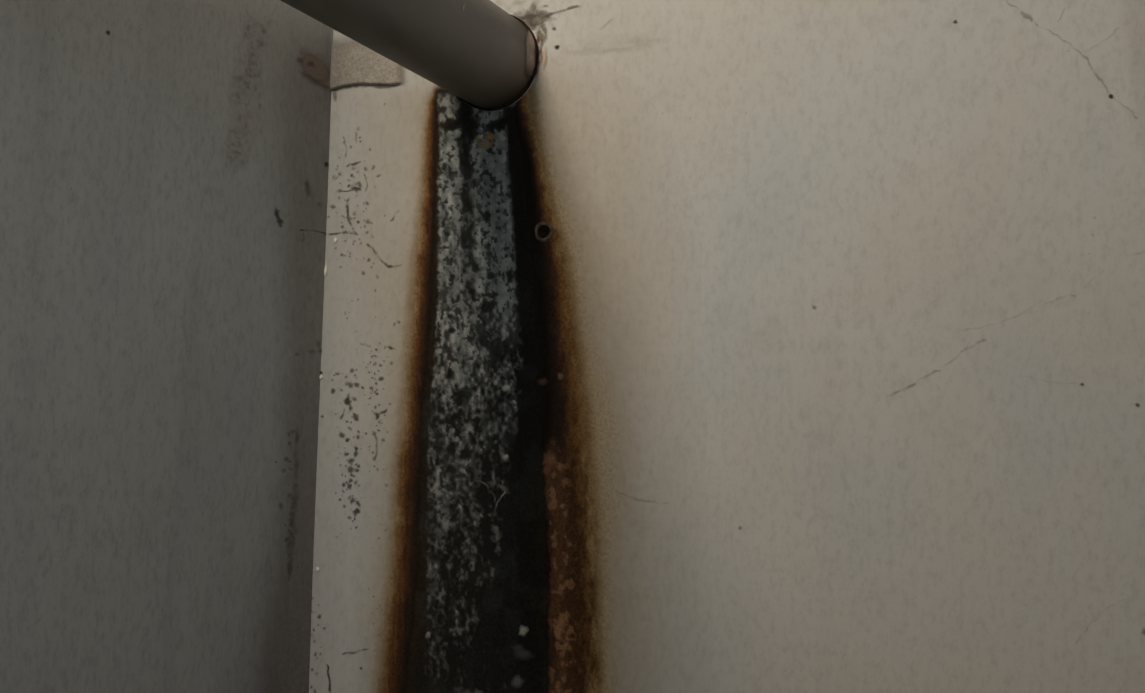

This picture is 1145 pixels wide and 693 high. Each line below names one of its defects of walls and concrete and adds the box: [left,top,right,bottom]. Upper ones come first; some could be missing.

damp [332,346,392,528]
damp [377,86,616,693]